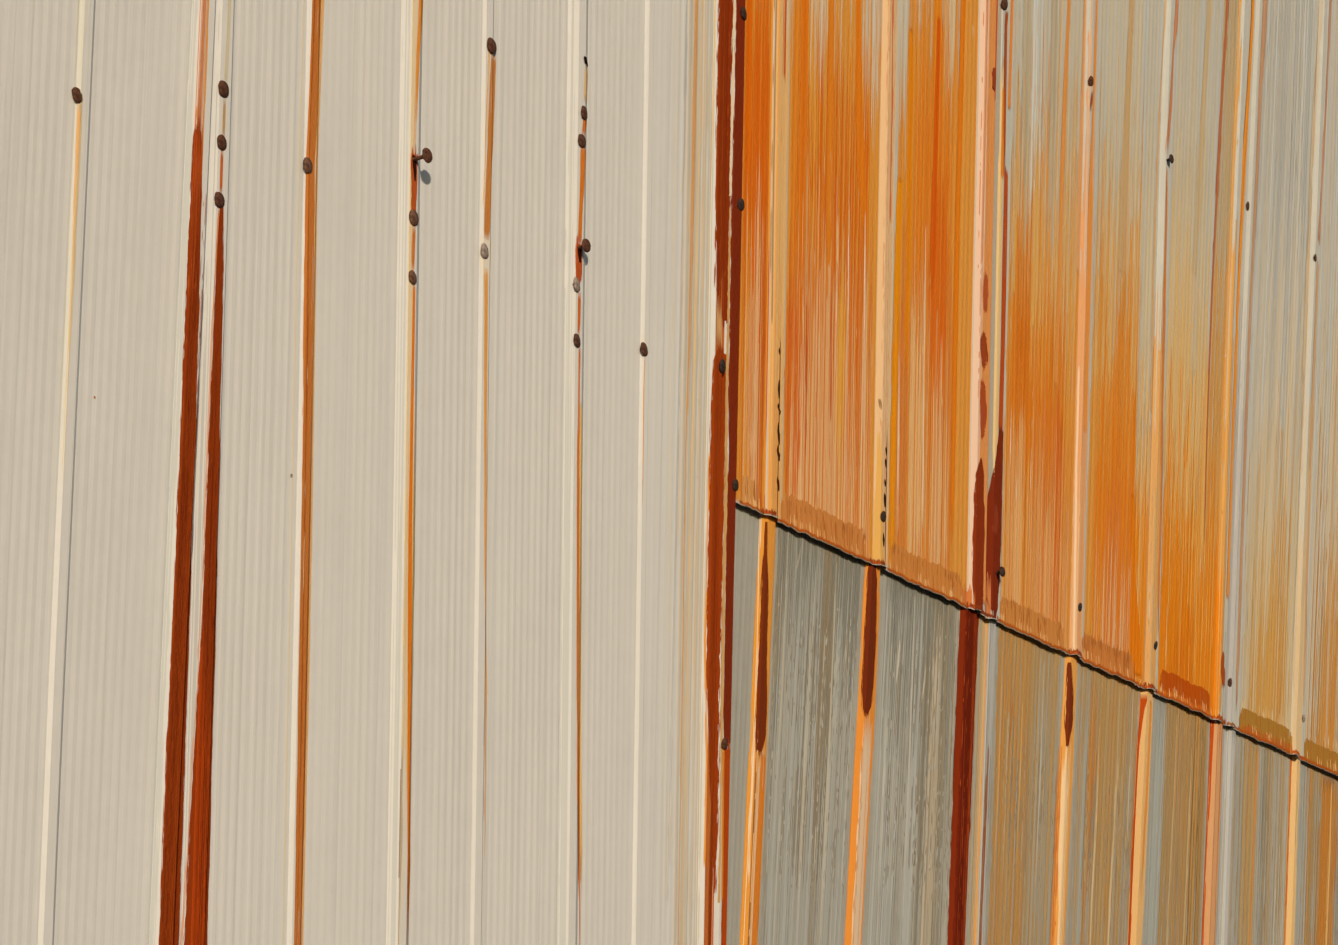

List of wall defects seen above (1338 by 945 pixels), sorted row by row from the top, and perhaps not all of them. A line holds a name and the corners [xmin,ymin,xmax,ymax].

rust [159,0,224,945]
rust [282,0,325,945]
rust [399,0,423,945]
rust [575,120,587,330]
rust [671,0,1338,945]